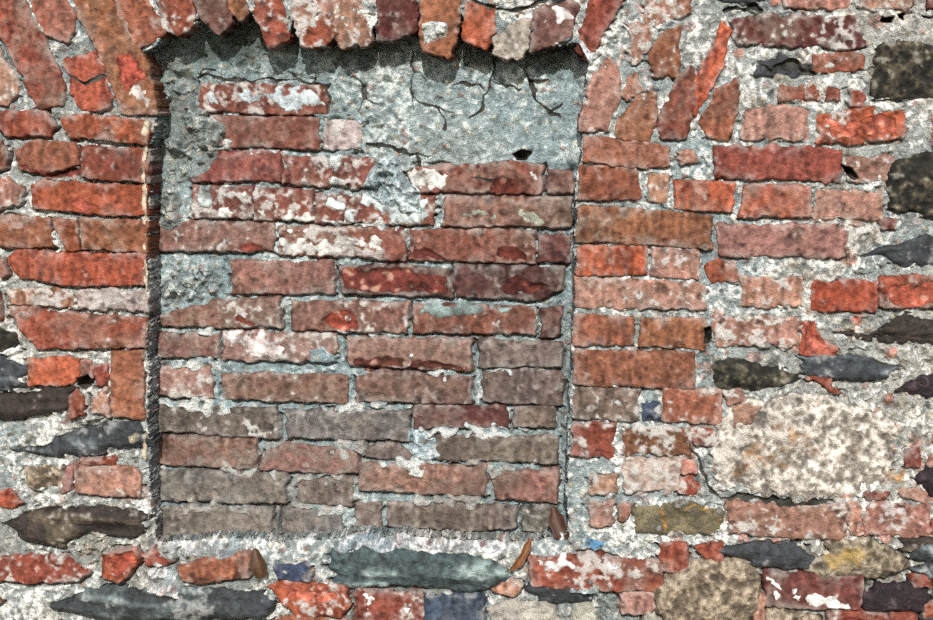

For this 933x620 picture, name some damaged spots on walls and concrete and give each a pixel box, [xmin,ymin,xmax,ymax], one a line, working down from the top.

crack [410,51,563,131]
crack [366,142,431,168]